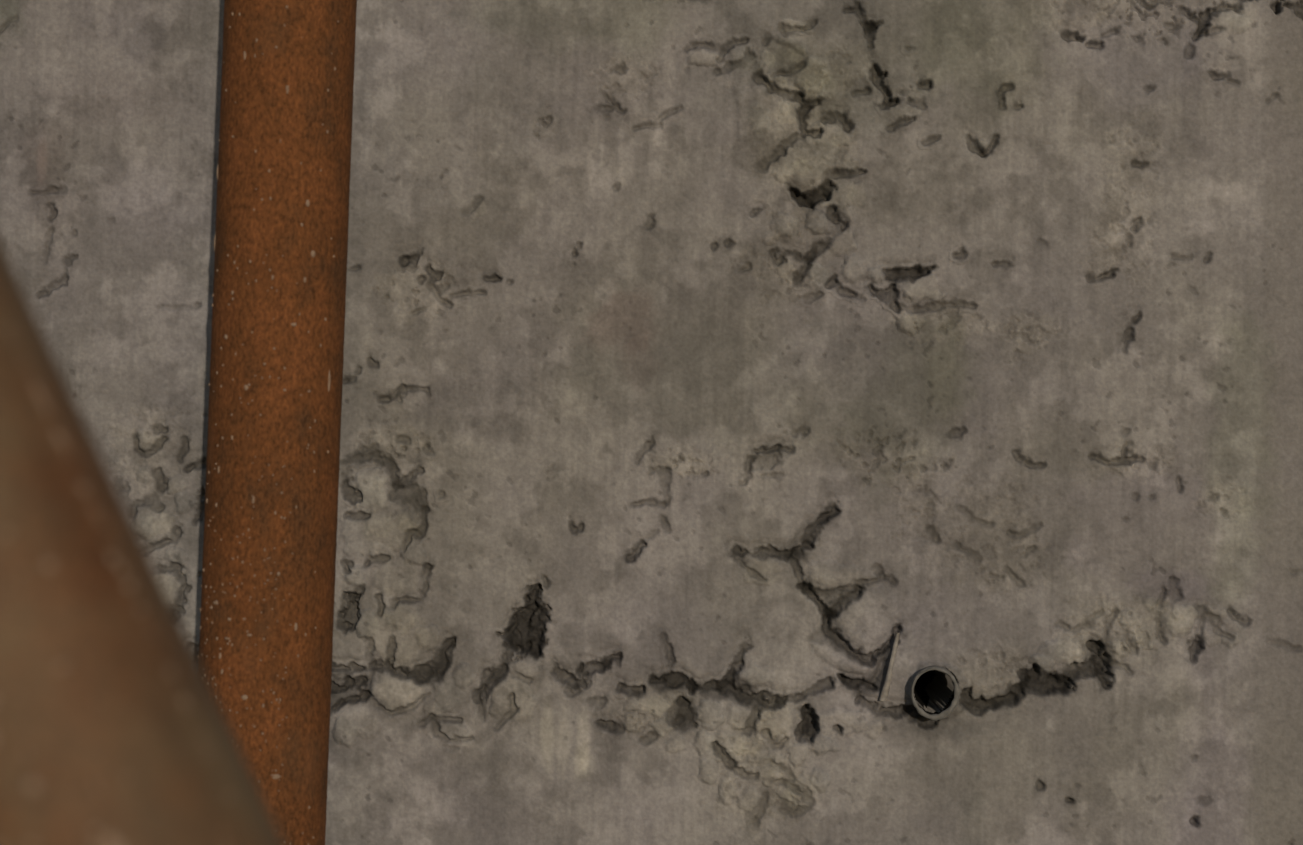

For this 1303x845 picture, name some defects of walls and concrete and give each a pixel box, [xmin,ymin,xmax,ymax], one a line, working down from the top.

hole [1023,0,1203,57]
peeling [707,232,739,255]
hole [103,396,205,516]
crack [920,500,1046,593]
crack [1050,604,1109,637]